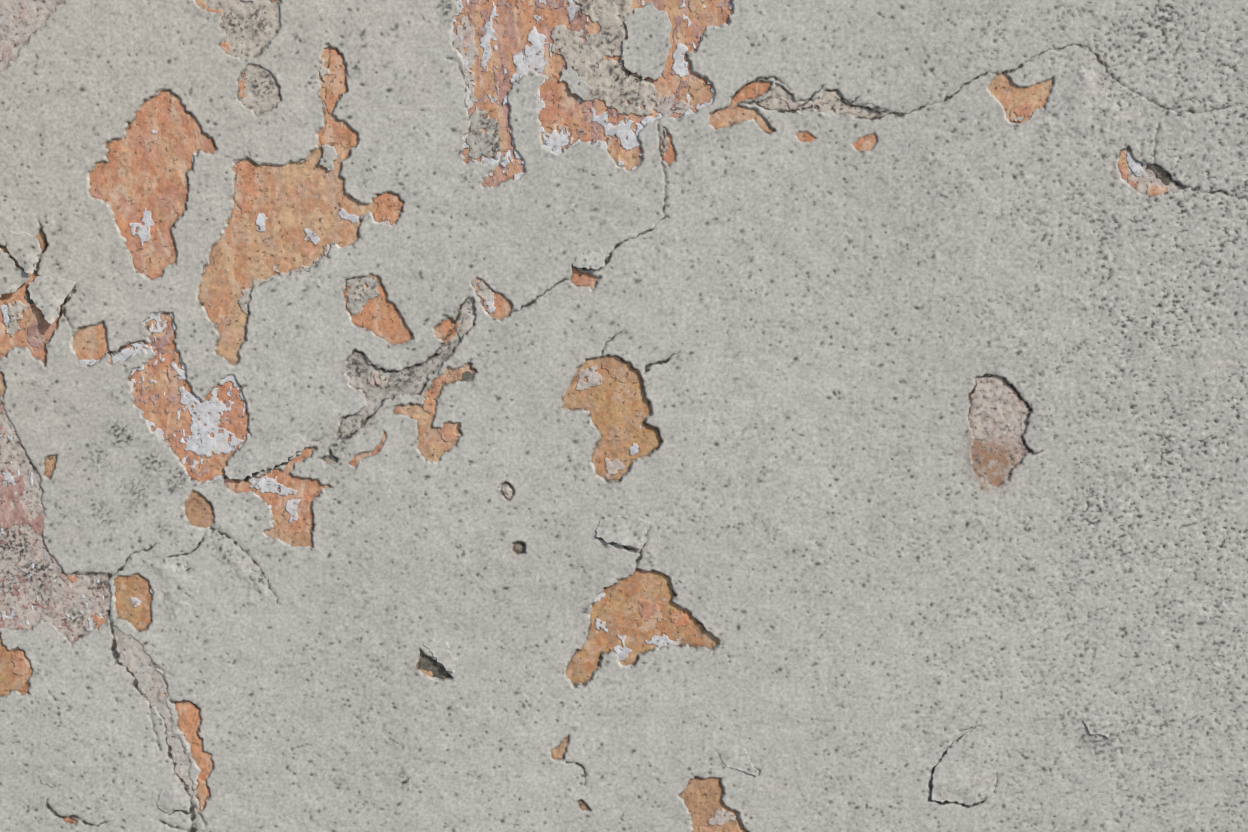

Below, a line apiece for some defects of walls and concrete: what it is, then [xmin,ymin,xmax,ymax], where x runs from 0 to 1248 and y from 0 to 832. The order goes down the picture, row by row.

crack [514,56,680,311]
peeling [449,0,881,189]
crack [713,44,1229,120]
crack [1146,150,1232,196]
peeling [72,44,413,547]
spalling [338,278,512,462]
peeling [562,355,662,482]
peeling [0,230,214,811]
crack [45,527,278,603]
peeling [566,569,719,686]
crack [107,610,204,832]
peeling [679,777,749,832]